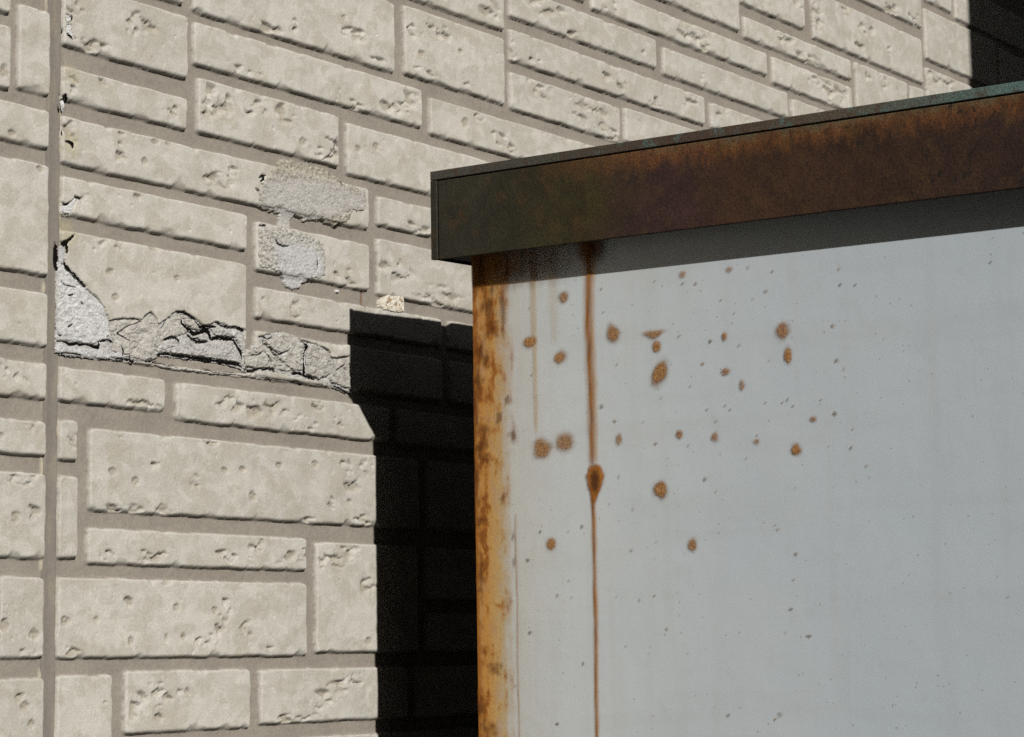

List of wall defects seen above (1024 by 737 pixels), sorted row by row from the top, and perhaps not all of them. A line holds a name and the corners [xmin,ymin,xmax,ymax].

spalling [53,246,353,394]
peeling [257,159,367,291]
corrosion [471,249,530,737]
corrosion [577,240,604,737]